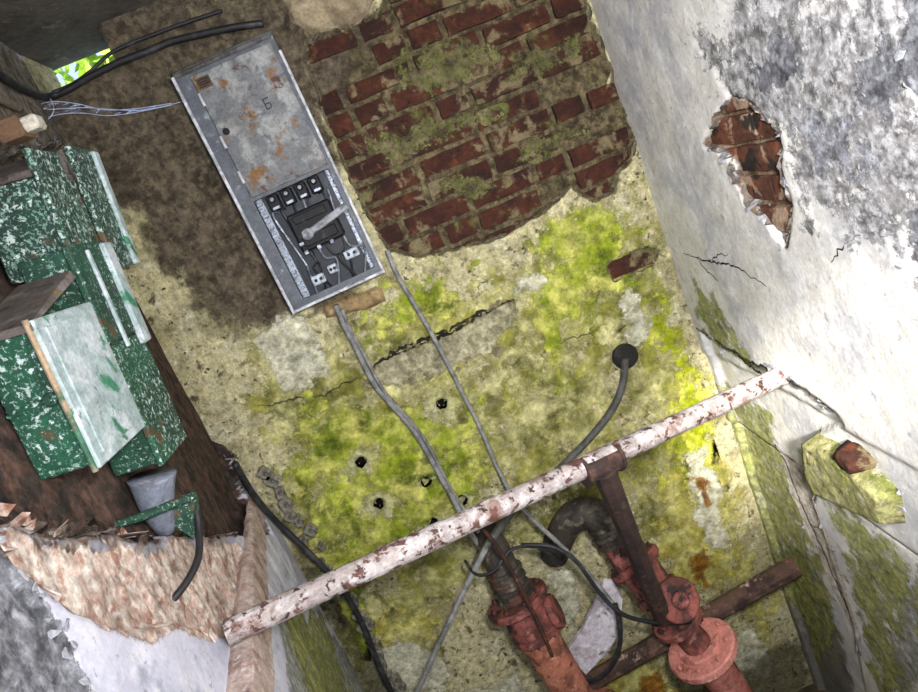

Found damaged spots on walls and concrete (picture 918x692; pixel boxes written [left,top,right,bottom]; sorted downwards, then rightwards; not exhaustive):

damp [746,28,805,95]
flaking render [303,0,637,258]
peeling [693,0,918,269]
damp [790,31,903,196]
damp [906,210,918,251]
damp [253,314,330,393]
damp [514,268,547,296]
damp [618,287,653,346]
damp [681,446,732,554]
spalling [0,503,243,692]
damp [547,569,583,628]
rust [638,671,666,692]